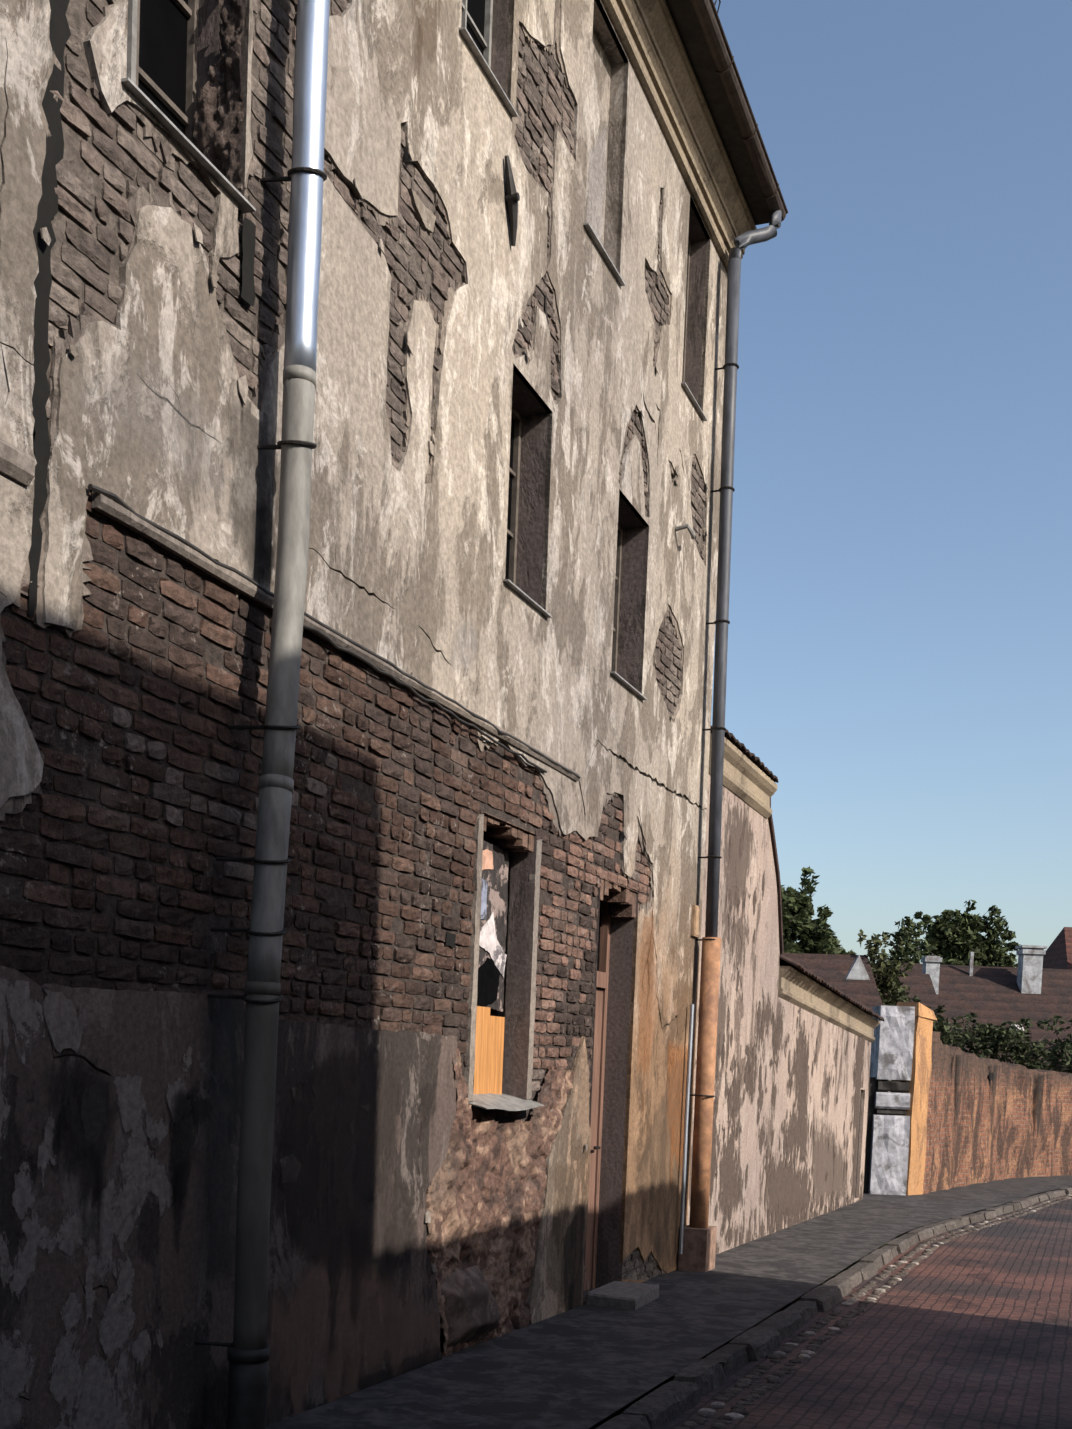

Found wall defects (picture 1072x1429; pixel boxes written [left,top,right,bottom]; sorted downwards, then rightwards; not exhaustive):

flaking render [33,0,298,456]
flaking render [324,123,466,484]
flaking render [512,0,575,405]
flaking render [618,406,649,517]
flaking render [645,189,671,374]
flaking render [0,1046,194,1429]
flaking render [0,491,273,1160]
leakage [170,1089,197,1249]
leakage [269,1044,442,1417]
flaking render [278,628,652,1357]
crack [612,753,703,810]
flaking render [653,606,683,721]